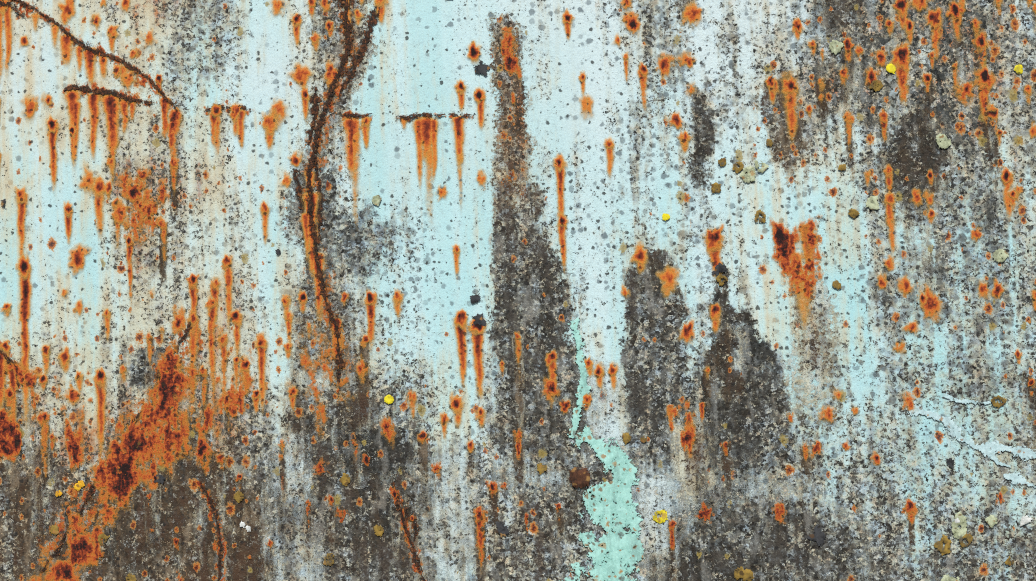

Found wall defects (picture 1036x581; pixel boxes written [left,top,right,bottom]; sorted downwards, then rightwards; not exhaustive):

rust [58,0,75,24]
rust [90,0,118,52]
rust [292,0,388,50]
rust [615,0,695,106]
rust [682,3,702,24]
rust [290,64,311,119]
rust [579,72,593,113]
rust [765,0,1022,352]
damp [0,0,483,581]
damp [485,0,871,581]
rust [0,187,267,581]
rust [543,351,618,413]